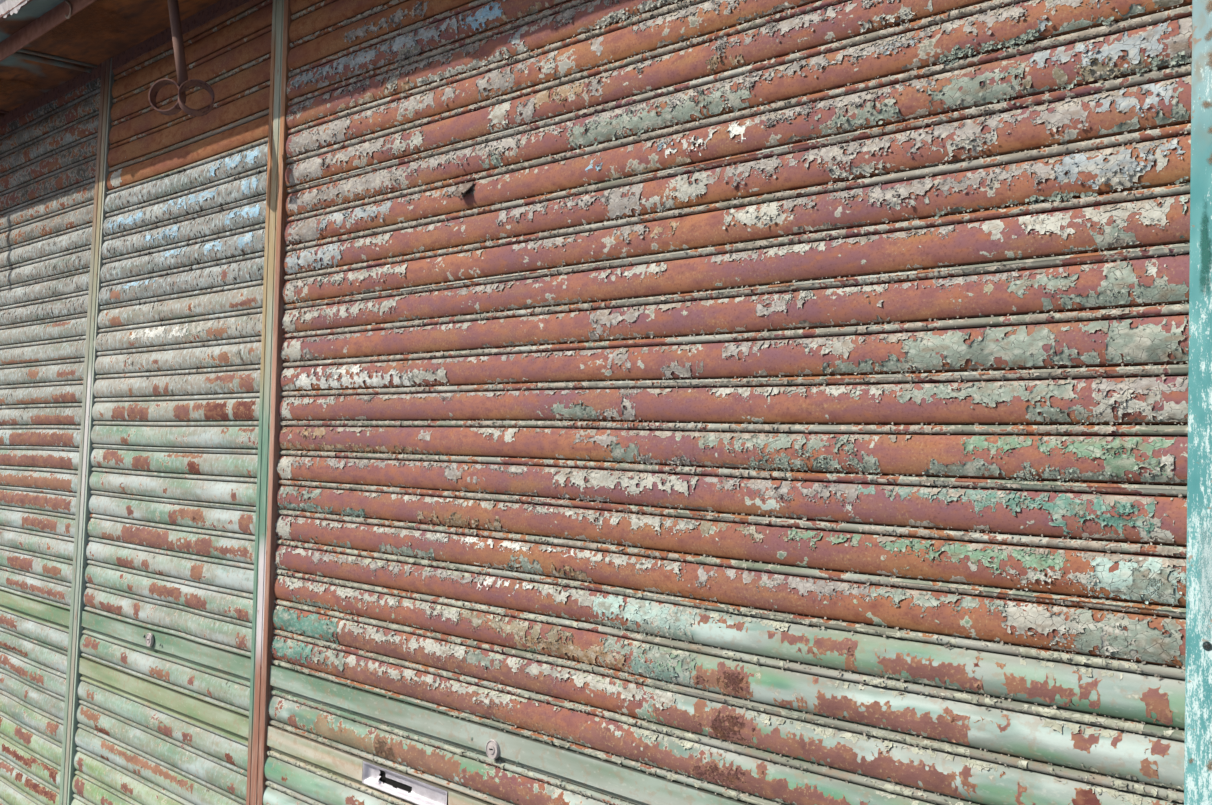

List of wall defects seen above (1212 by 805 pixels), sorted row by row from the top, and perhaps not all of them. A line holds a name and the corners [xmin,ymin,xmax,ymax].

peeling [106,146,262,261]
rust [0,356,77,534]
peeling [129,320,215,344]
rust [99,326,256,435]
peeling [266,0,1211,805]
rust [84,483,253,620]
rust [0,717,60,804]
rust [80,689,194,805]
rust [312,626,1011,805]
rust [875,649,1102,713]
rust [1068,787,1101,805]
rust [1069,726,1123,754]